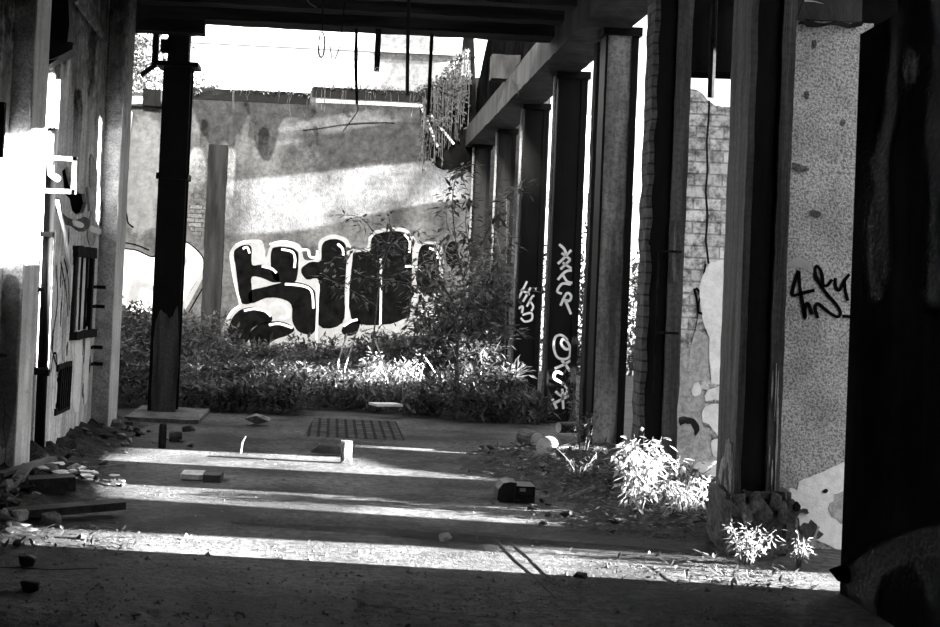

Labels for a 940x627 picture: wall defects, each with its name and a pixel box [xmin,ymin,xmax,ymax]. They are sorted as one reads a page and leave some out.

flaking render [769,363,779,491]
flaking render [786,462,844,550]